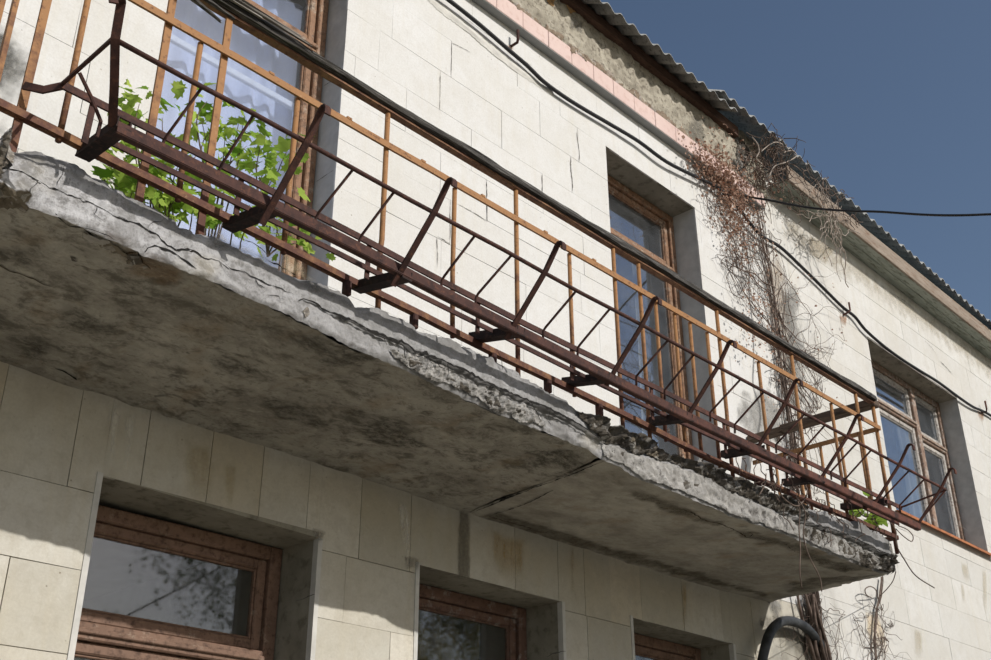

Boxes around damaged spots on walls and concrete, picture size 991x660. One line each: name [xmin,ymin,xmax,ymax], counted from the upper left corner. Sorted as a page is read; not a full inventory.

water stain [0,35,25,85]
flaking render [508,0,695,142]
spalling [0,125,32,212]
crack [9,168,599,438]
spalling [390,348,546,426]
crack [477,461,604,529]
spalling [576,411,900,574]